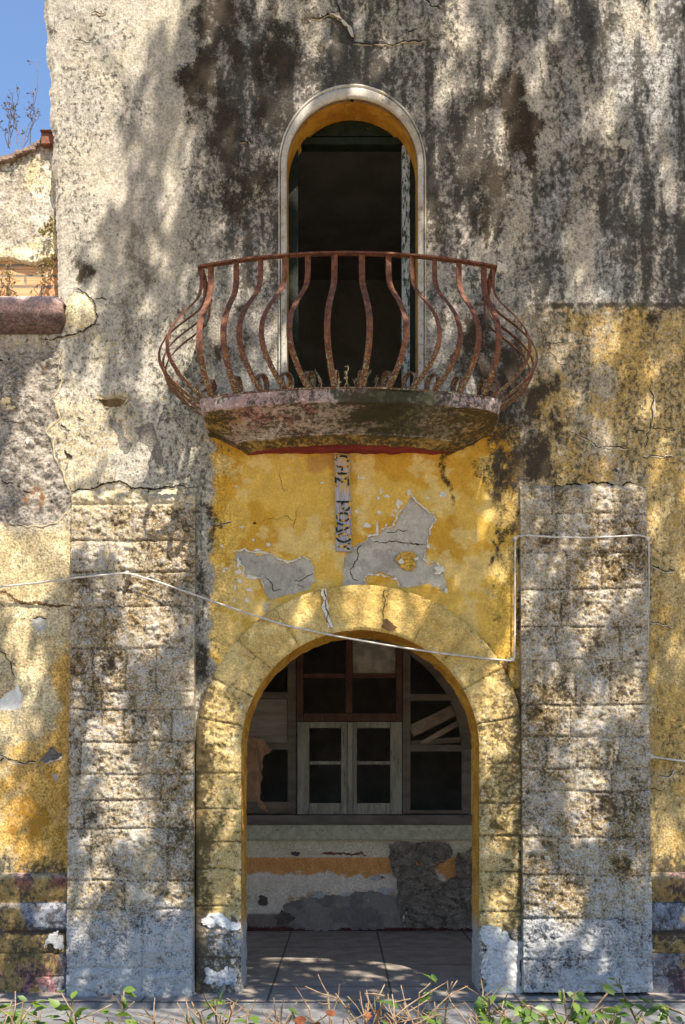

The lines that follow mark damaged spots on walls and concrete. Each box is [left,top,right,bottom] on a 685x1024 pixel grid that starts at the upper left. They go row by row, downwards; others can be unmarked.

crack [309,0,340,21]
crack [353,29,427,47]
water stain [172,0,324,231]
water stain [463,60,560,251]
water stain [67,243,96,283]
water stain [438,292,575,564]
crack [71,480,193,493]
crack [0,590,71,609]
peeling [221,538,324,612]
peeling [332,487,448,631]
peeling [202,912,241,930]
flaking render [275,841,523,994]